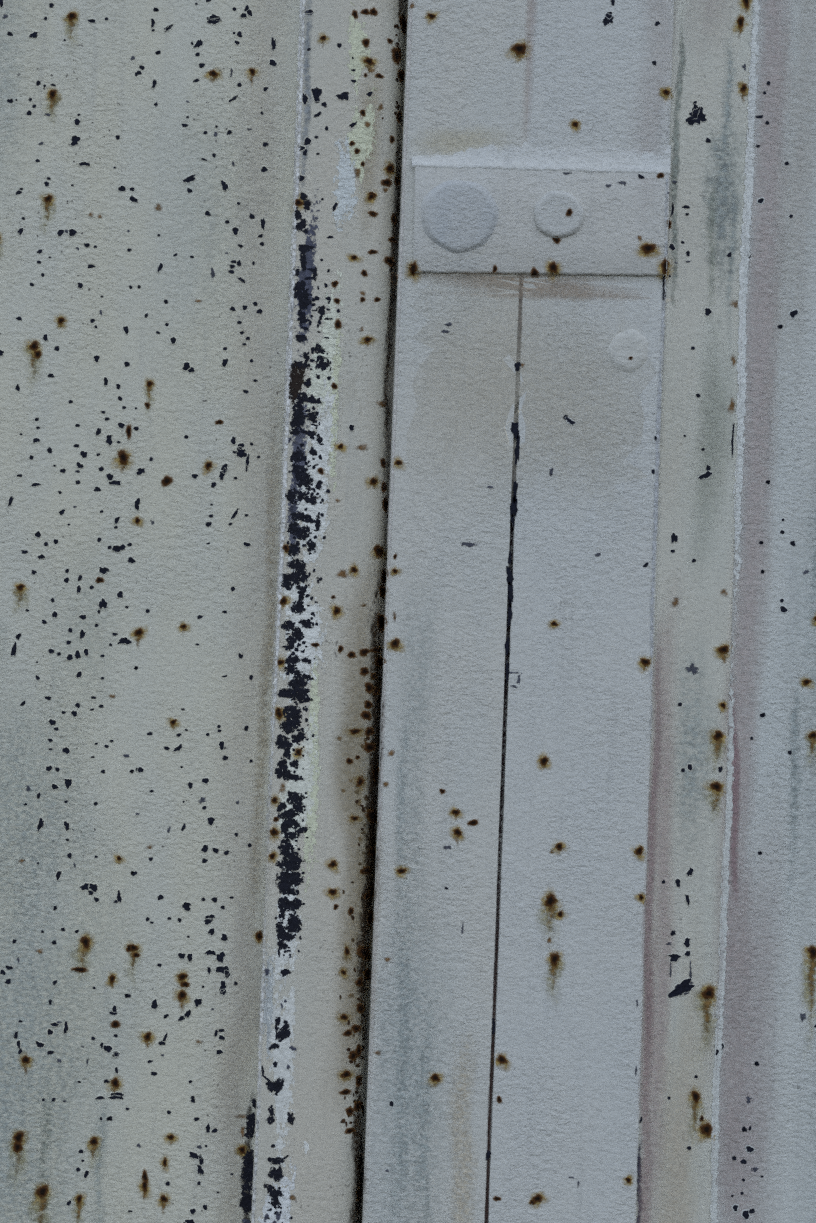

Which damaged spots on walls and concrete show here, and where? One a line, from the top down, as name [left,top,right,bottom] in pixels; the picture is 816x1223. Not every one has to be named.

peeling [195,0,253,45]
peeling [296,57,356,156]
peeling [20,354,152,492]
peeling [190,435,260,488]
peeling [265,174,340,977]
corrosion [326,545,403,1223]
peeling [146,896,238,1045]
corrosion [804,945,816,1009]
peeling [91,1034,129,1110]
peeling [261,999,296,1125]
peeling [188,1080,217,1185]
peeling [263,1144,293,1223]